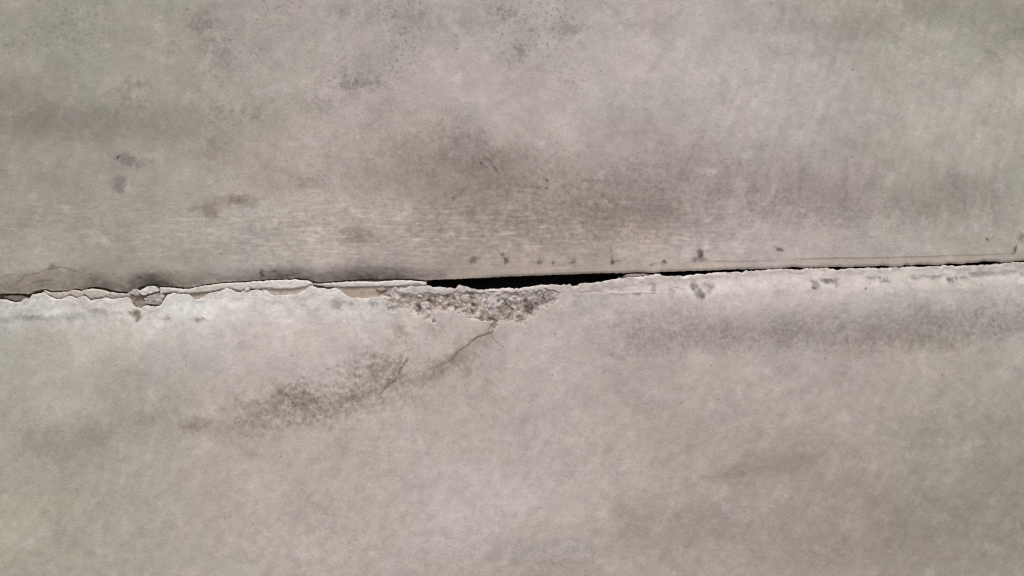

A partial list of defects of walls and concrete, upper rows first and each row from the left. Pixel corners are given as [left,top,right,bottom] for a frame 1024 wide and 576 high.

spalling [44,273,560,331]
crack [0,260,1024,306]